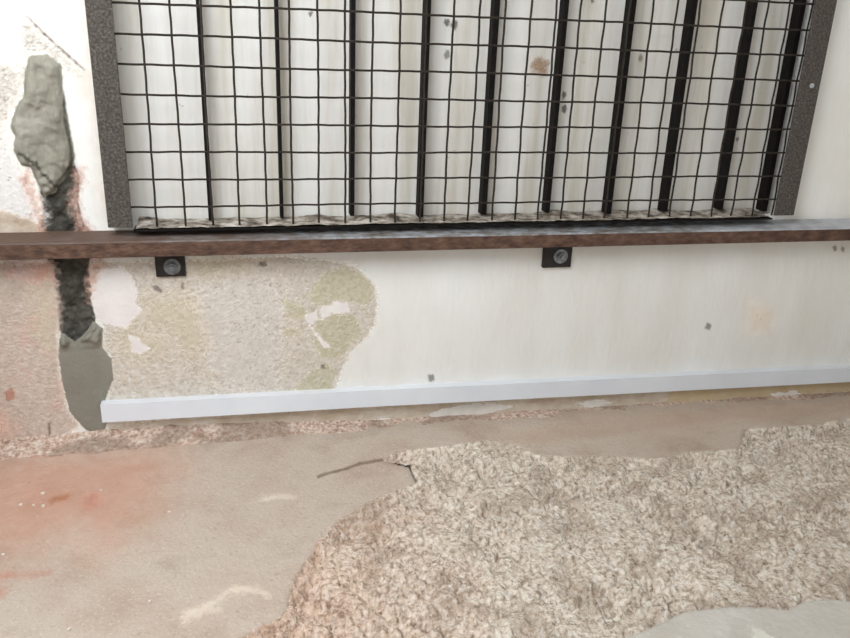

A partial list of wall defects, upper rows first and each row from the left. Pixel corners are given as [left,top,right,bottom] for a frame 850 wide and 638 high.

peeling [0,17,79,233]
peeling [90,256,378,400]
crack [318,459,381,477]
peeling [111,382,850,430]
spalling [243,418,850,638]